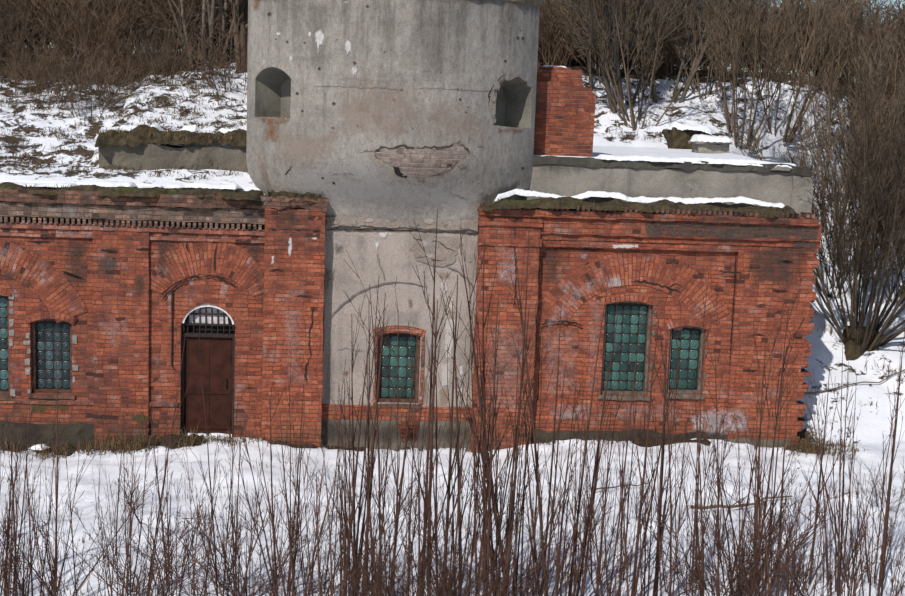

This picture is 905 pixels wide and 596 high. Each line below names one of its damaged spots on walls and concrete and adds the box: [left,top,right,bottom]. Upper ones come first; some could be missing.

spalling [360,141,470,183]
crack [266,227,478,235]
crack [634,280,681,292]
crack [305,254,475,383]